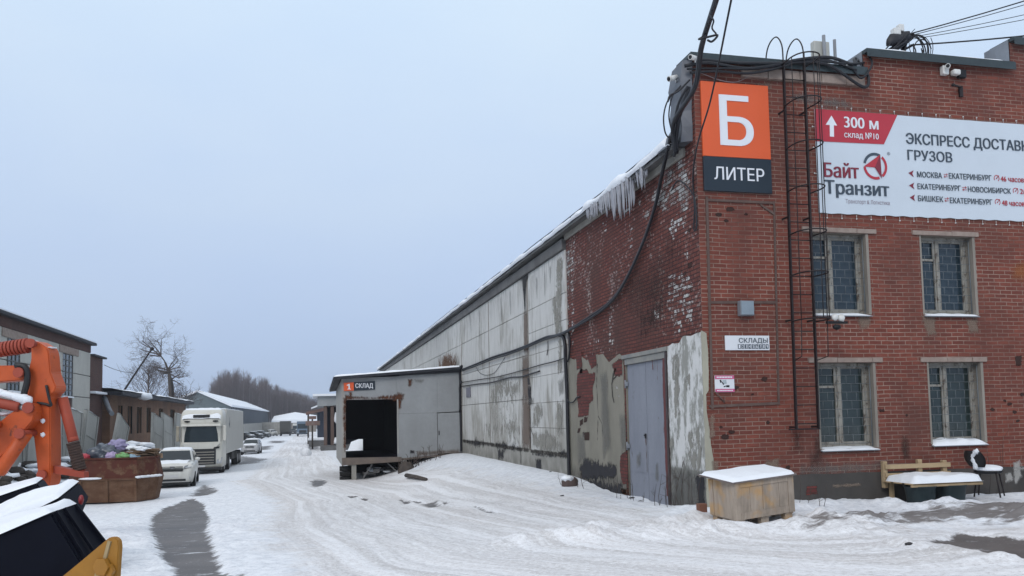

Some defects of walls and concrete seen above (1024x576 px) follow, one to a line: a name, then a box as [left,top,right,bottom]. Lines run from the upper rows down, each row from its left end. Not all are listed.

damp [625,160,690,239]
damp [521,274,537,447]
spalling [612,359,622,377]
rust [343,379,421,450]
spalling [620,452,628,495]